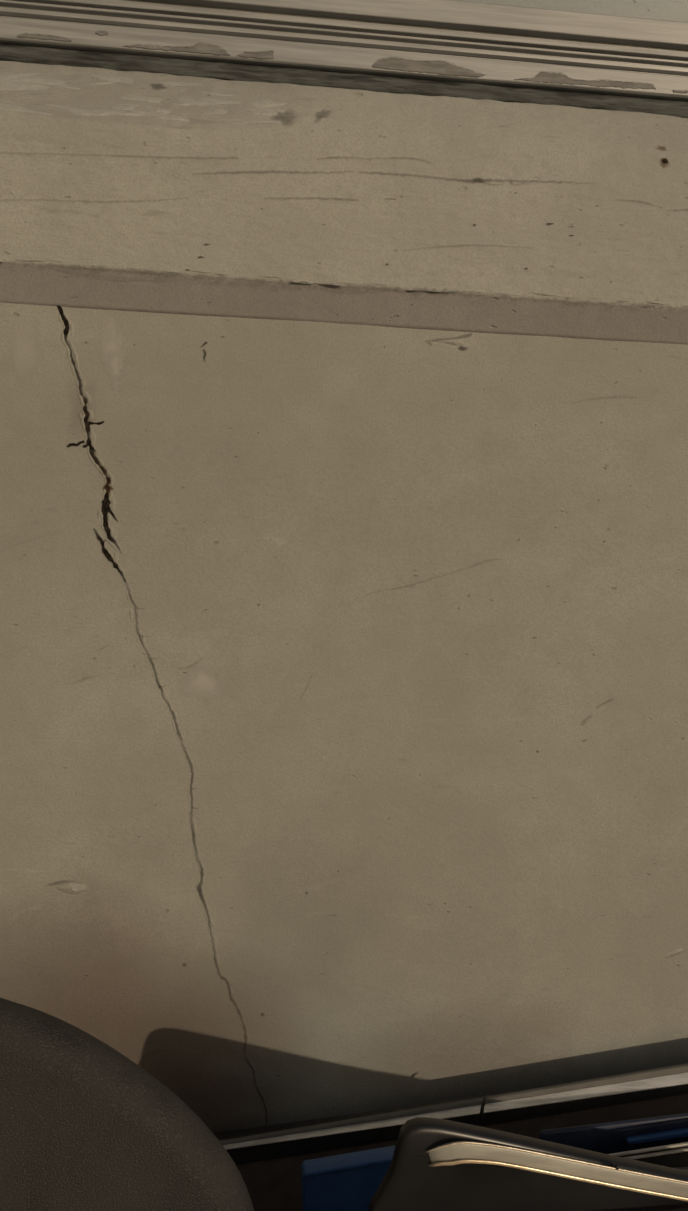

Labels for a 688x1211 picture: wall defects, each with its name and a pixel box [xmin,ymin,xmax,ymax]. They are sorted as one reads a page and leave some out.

crack [55,305,270,1123]